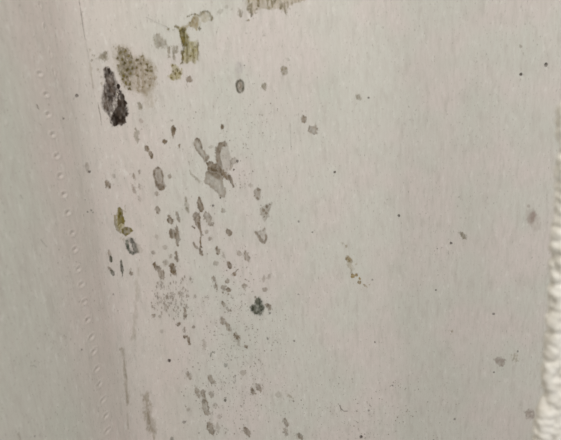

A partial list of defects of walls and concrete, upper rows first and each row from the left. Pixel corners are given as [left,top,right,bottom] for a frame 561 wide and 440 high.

damp [87,4,230,197]
damp [187,113,277,246]
damp [112,194,307,440]